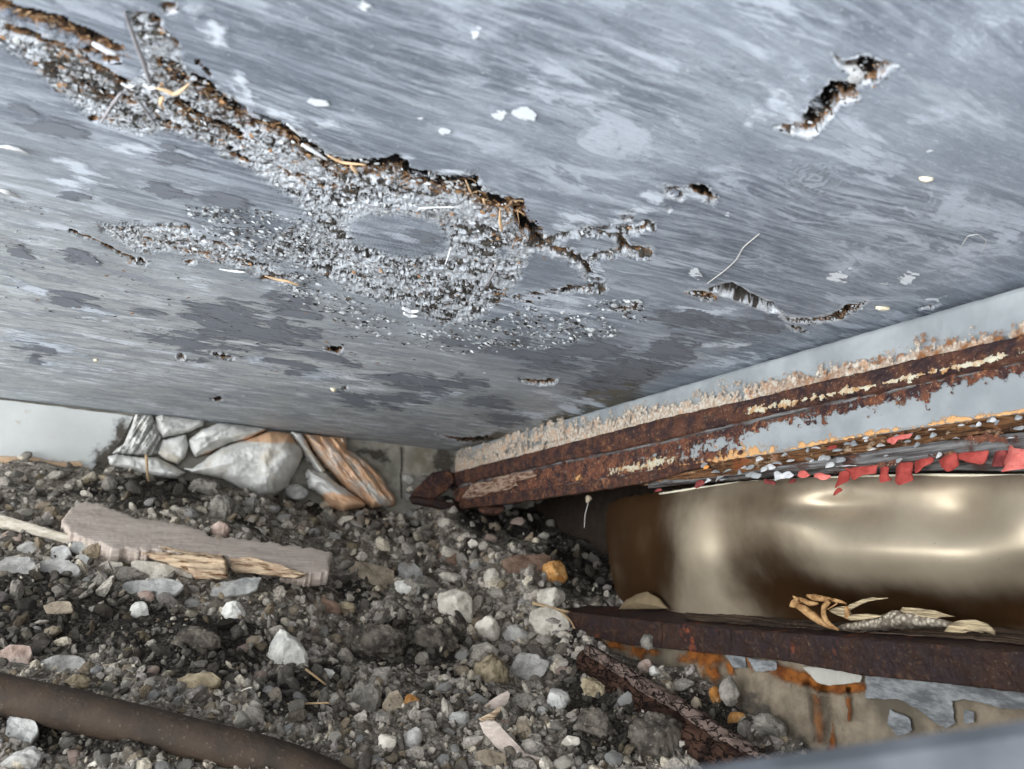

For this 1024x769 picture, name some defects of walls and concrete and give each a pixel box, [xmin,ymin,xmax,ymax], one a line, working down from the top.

spalling [0,0,648,377]
spalling [681,285,718,305]
spalling [778,296,872,335]
rust [454,352,1024,510]
peeling [695,415,1024,496]
rust [678,651,733,680]
rust [772,665,865,748]